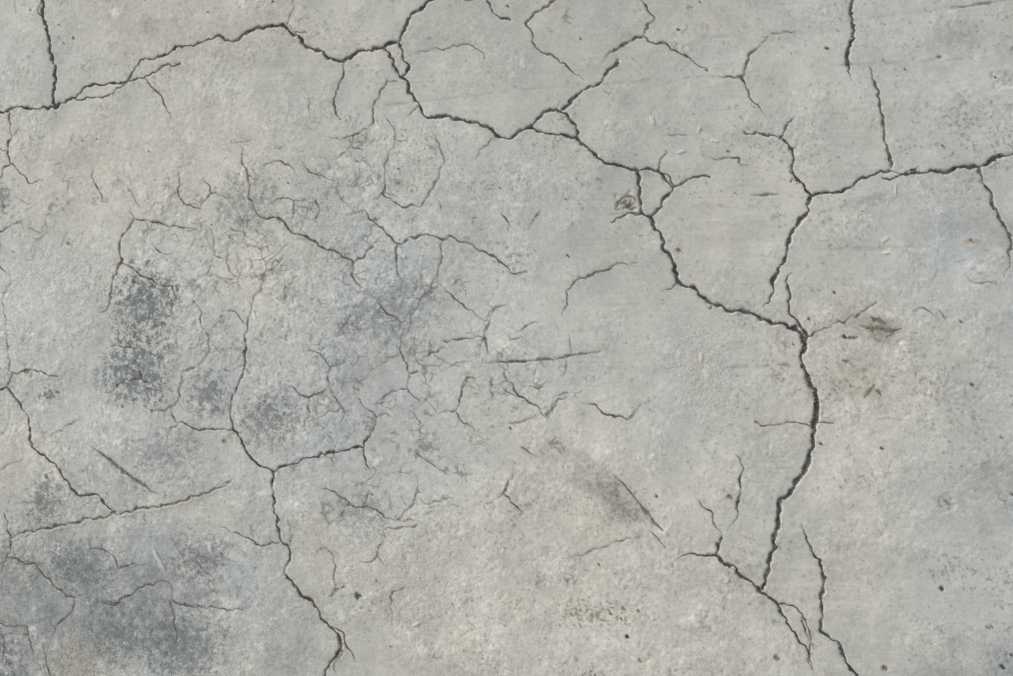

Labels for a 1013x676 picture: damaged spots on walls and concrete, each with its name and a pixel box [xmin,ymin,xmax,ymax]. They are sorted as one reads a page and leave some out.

crack [846,0,855,81]
crack [0,201,247,676]
crack [146,147,568,676]
crack [0,0,833,597]
crack [743,65,1013,308]
crack [678,500,818,668]
crack [802,528,858,676]